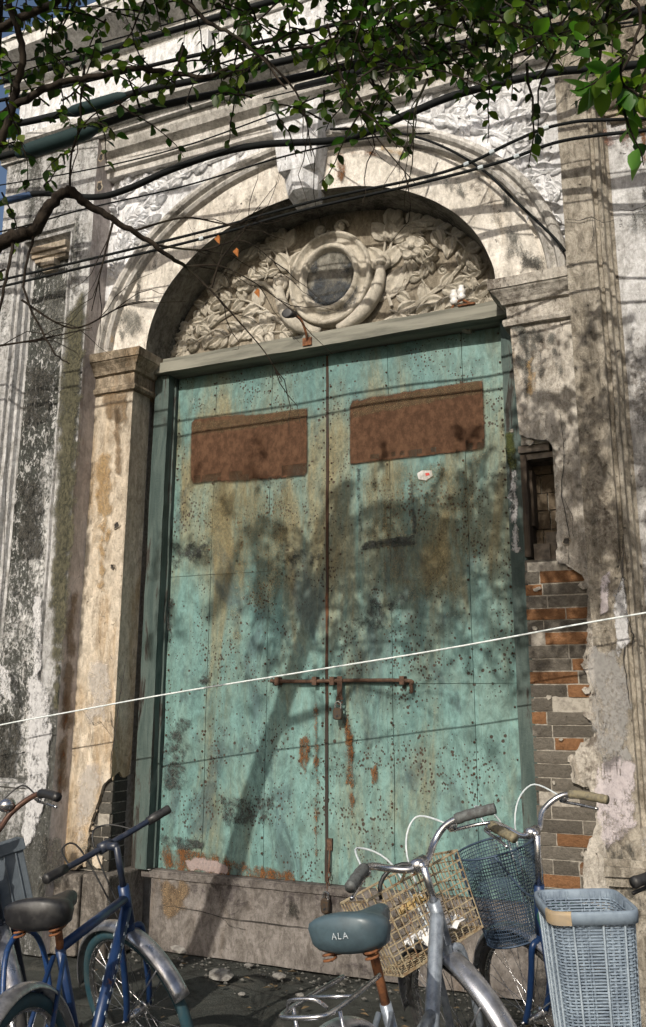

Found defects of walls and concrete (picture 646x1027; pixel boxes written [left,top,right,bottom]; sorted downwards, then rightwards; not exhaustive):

damp [628,170,646,230]
damp [23,276,66,427]
damp [16,478,42,559]
damp [96,392,126,588]
corrosion [190,408,307,483]
corrosion [350,380,485,464]
damp [0,712,21,779]
damp [58,594,77,802]
flaking render [74,773,128,872]
corrosion [298,704,320,855]
corrosion [343,719,354,815]
flaking render [505,429,637,889]